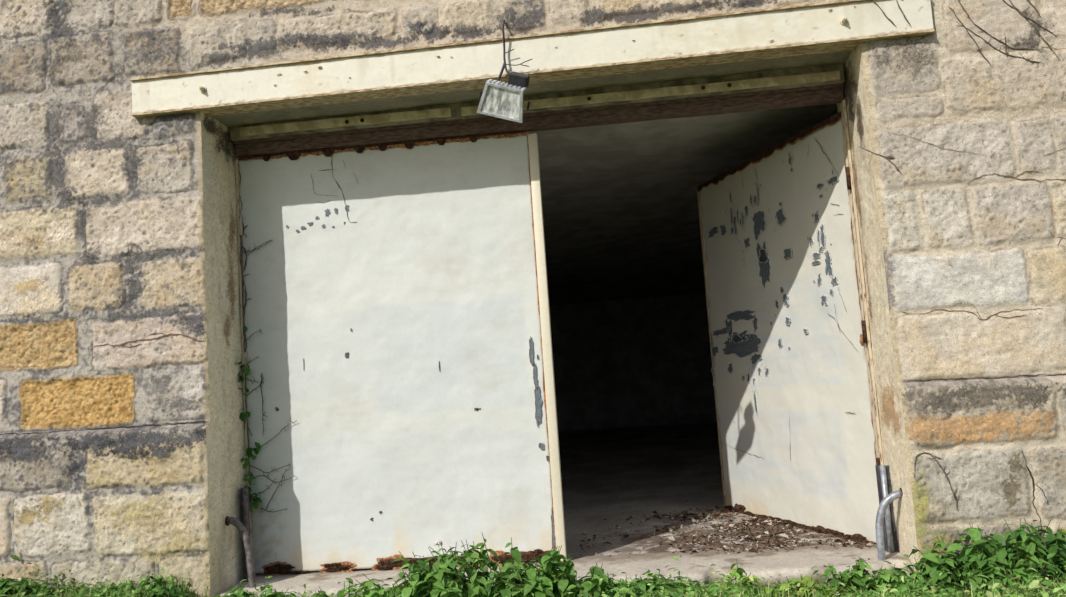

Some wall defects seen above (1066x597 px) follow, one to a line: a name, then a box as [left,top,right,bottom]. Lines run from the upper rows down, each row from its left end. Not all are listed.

damp [201,5,545,67]
damp [579,0,777,27]
crack [894,133,1066,184]
peeling [286,205,349,232]
peeling [807,170,838,306]
peeling [706,182,791,416]
crack [94,333,201,348]
damp [0,375,210,485]
peeling [529,336,542,427]
damp [901,379,1066,420]
crack [1022,452,1048,529]
corrosion [262,561,356,576]